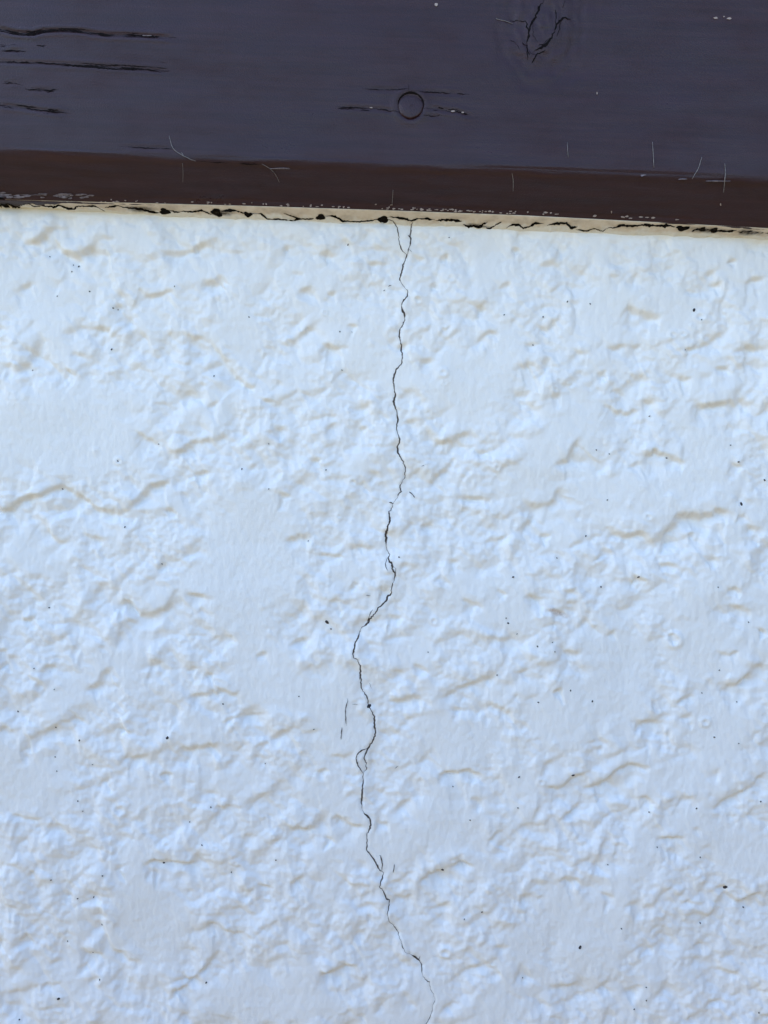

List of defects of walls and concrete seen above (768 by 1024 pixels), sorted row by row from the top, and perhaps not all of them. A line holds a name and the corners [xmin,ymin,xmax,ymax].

crack [11,203,768,1022]